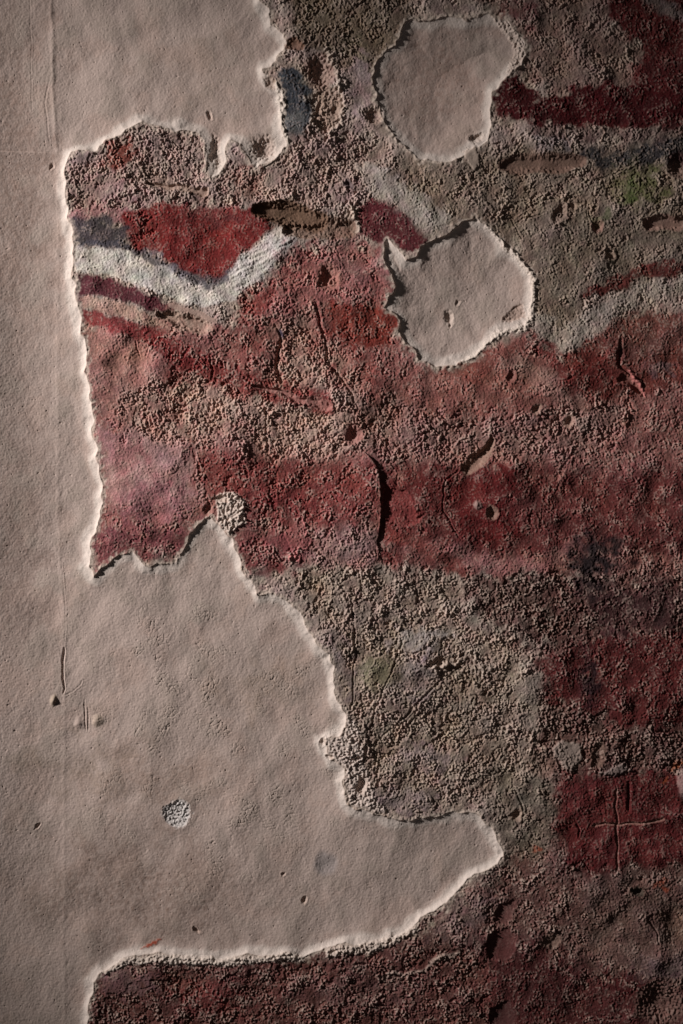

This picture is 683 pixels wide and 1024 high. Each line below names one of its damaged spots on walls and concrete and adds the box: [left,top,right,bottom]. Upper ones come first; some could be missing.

spalling [490,15,527,77]
spalling [70,85,386,243]
spalling [457,140,683,233]
spalling [155,302,217,338]
spalling [458,224,540,364]
spalling [123,341,350,462]
spalling [362,395,496,476]
spalling [210,490,248,537]
spalling [297,567,683,816]
peeling [159,796,193,830]
spalling [99,950,306,976]
spalling [324,897,520,1024]